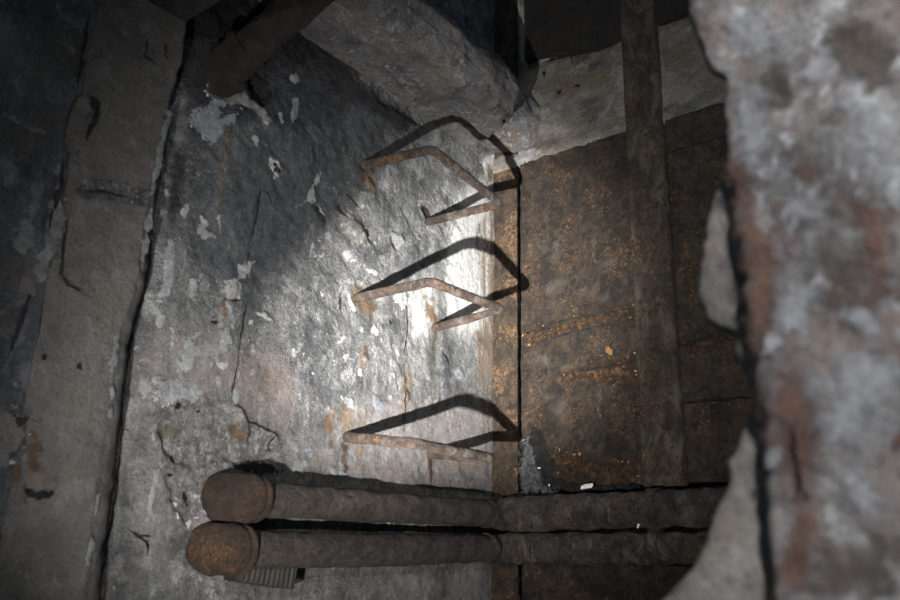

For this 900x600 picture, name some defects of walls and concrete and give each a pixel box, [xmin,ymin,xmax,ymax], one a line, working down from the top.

peeling [188,74,299,145]
corrosion [422,295,439,340]
crack [231,304,281,453]